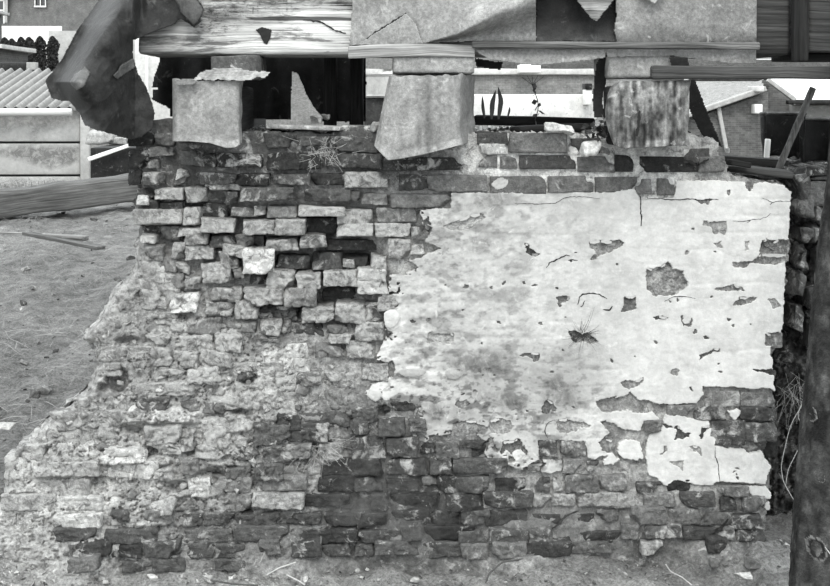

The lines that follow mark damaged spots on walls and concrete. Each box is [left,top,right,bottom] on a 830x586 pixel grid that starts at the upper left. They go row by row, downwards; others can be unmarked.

crack [640,196,718,226]
spalling [589,240,624,260]
peeling [691,220,727,253]
spalling [732,239,790,268]
spalling [621,296,636,312]
spalling [645,262,688,303]
spalling [710,284,756,306]
spalling [765,332,782,348]
spalling [621,377,643,389]
spalling [541,400,590,433]
spalling [487,418,528,455]
spalling [663,423,710,456]